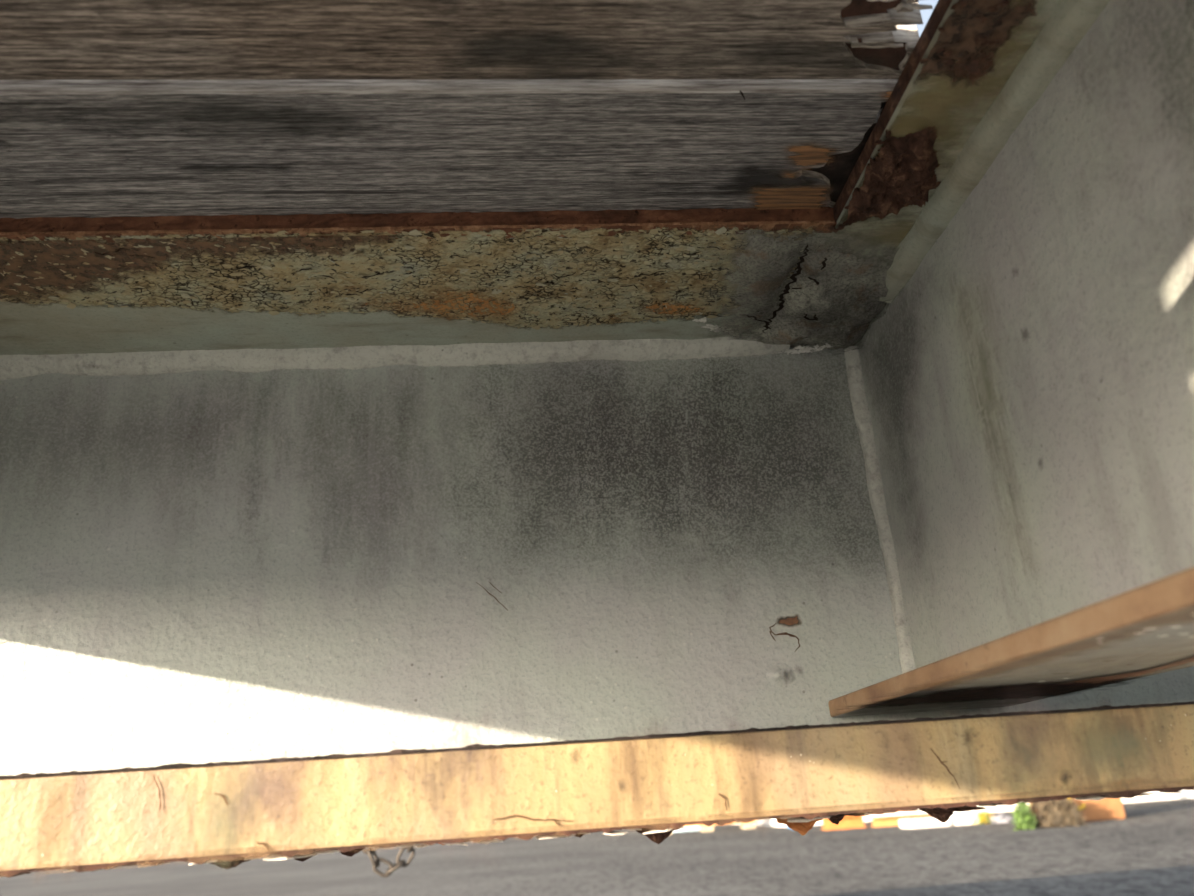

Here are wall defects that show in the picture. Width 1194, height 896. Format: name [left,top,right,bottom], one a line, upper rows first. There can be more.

corrosion [913,0,1037,87]
corrosion [0,126,941,301]
corrosion [0,609,1194,779]
peeling [244,850,341,860]
corrosion [0,786,1194,878]
peeling [534,826,686,839]
peeling [781,812,870,822]
peeling [935,804,999,812]